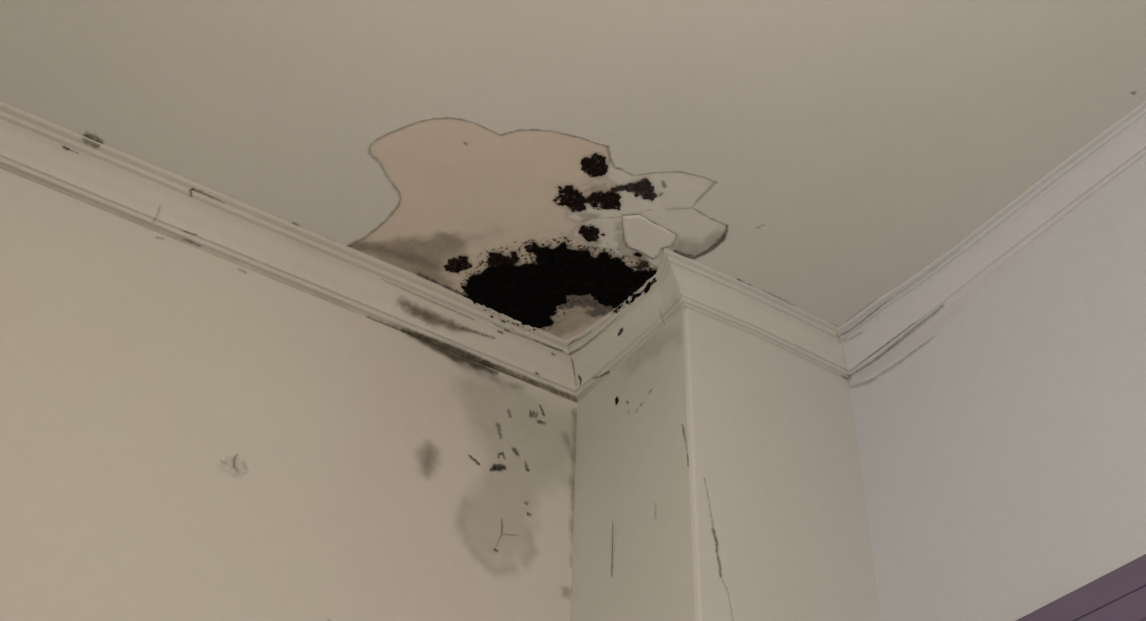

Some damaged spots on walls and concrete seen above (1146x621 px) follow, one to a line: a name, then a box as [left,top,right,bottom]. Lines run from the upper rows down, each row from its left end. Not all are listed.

leakage [580,153,608,177]
peeling [349,117,727,296]
leakage [386,178,665,331]
leakage [404,303,494,338]
leakage [374,320,577,401]
peeling [540,295,608,340]